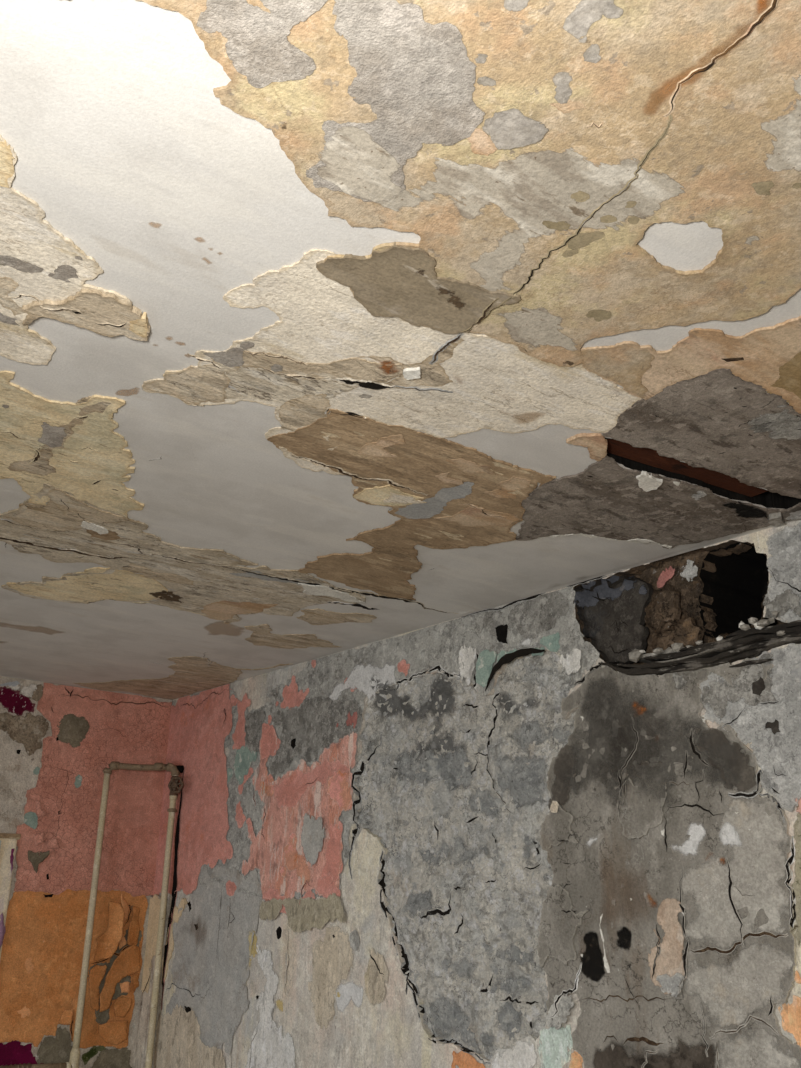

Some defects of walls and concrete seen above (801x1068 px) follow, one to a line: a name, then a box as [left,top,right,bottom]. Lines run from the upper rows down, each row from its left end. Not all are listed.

rust [648,69,699,111]
crack [187,0,779,393]
peeling [0,0,801,625]
crack [326,409,366,418]
flaking render [0,522,801,1068]
crack [348,732,491,1064]
crack [377,648,545,815]
crack [573,661,653,685]
crack [546,714,798,1068]
water stain [673,824,705,854]
water stain [720,823,741,845]